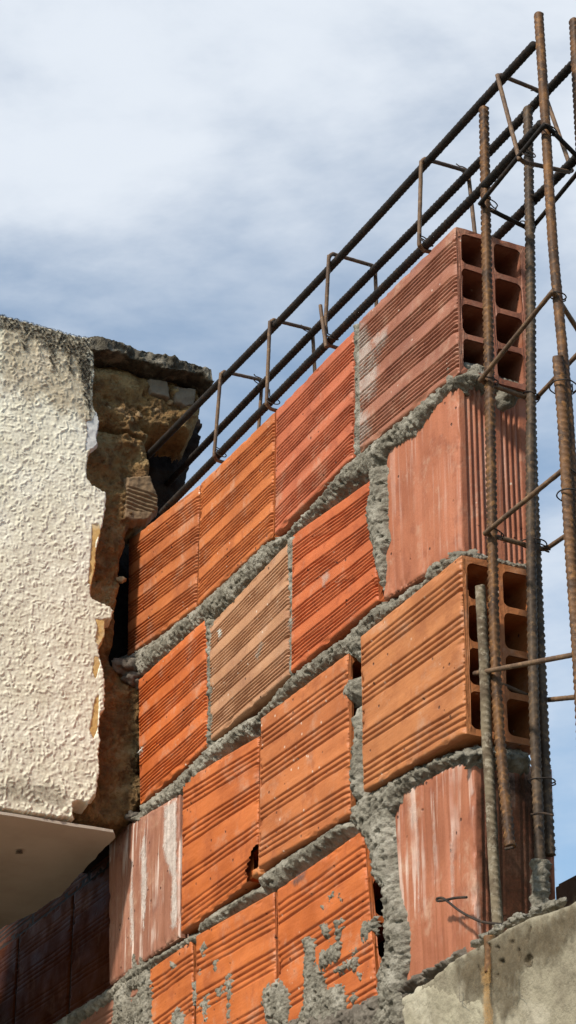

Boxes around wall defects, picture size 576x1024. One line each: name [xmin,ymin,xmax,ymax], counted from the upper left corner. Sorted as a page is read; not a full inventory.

flaking render [72,11,576,932]
damp [130,836,147,940]
damp [163,801,177,927]